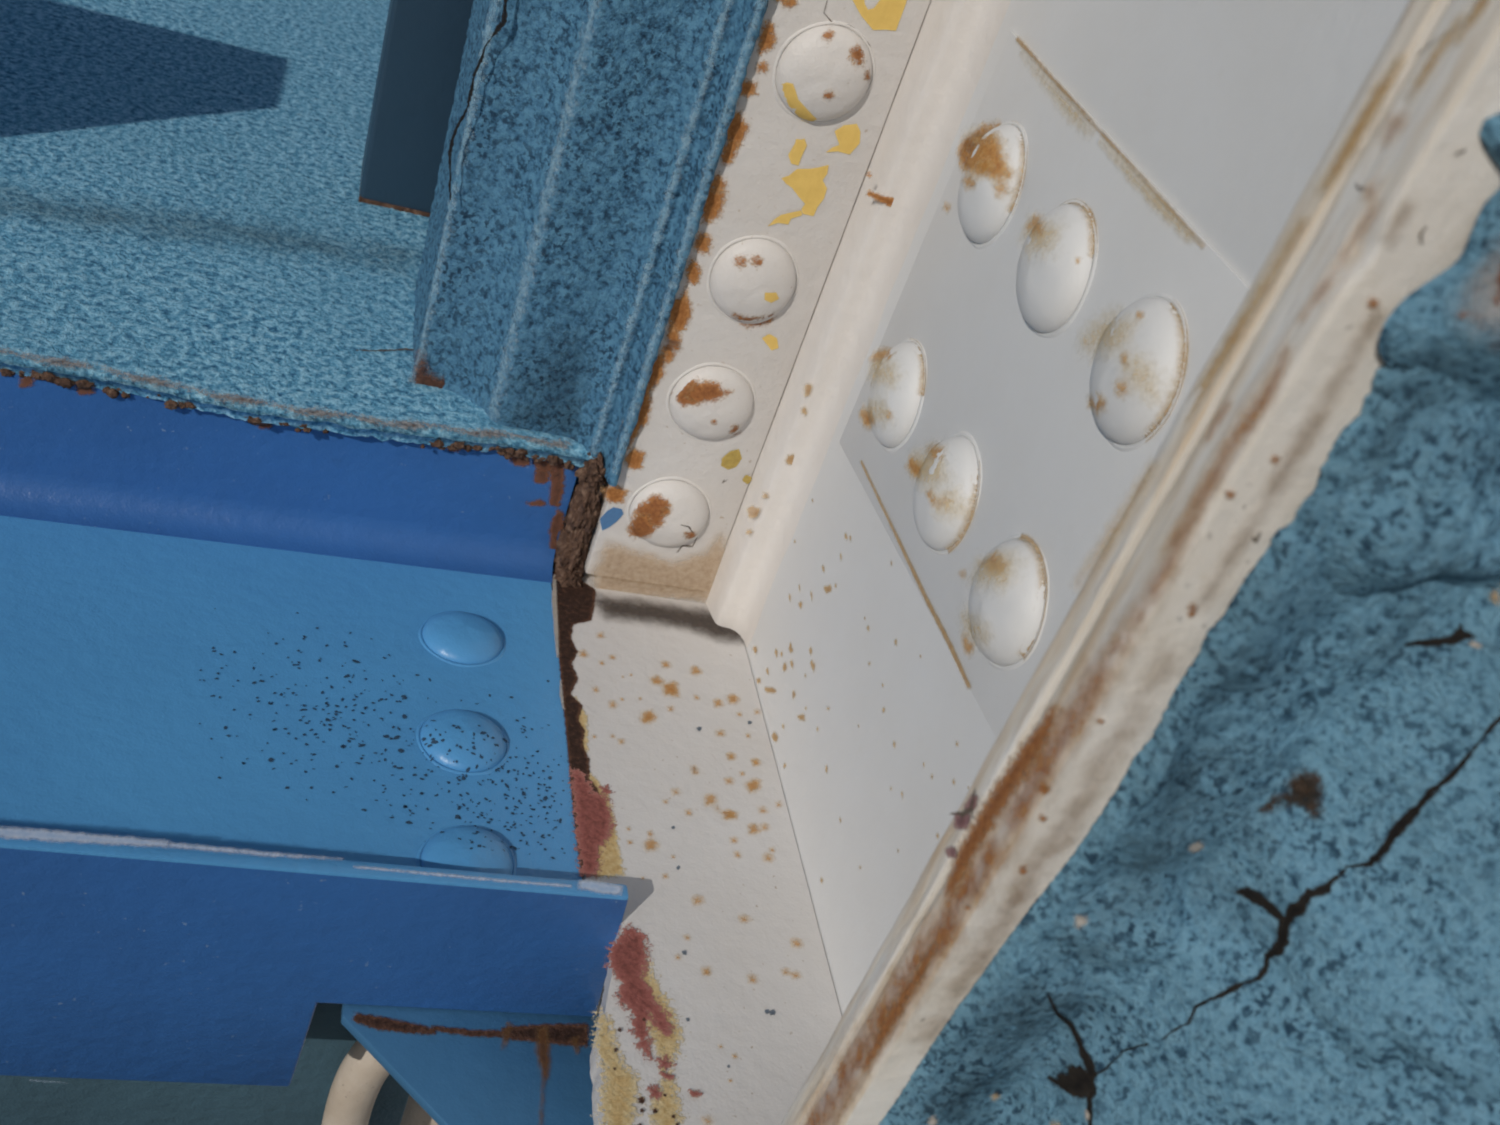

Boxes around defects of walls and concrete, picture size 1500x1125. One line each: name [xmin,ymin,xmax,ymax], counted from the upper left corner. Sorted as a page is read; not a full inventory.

corrosion [625,21,777,470]
corrosion [866,172,894,207]
corrosion [958,124,1027,212]
corrosion [0,368,196,410]
corrosion [413,350,445,389]
corrosion [420,440,672,871]
corrosion [861,461,975,688]
crack [1404,623,1477,647]
corrosion [807,674,1104,1125]
crack [1047,716,1500,1125]
corrosion [353,1013,589,1119]
peeling [589,922,703,1125]